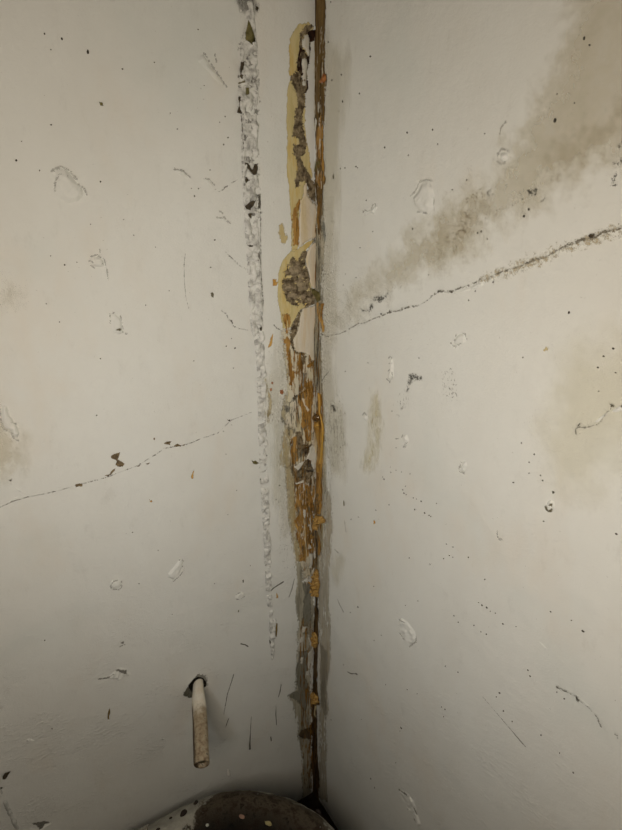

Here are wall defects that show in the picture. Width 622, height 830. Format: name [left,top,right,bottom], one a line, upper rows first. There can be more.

crack [3,415,241,506]
peeling [245,194,264,306]
peeling [273,22,321,334]
corrosion [280,0,327,800]
spalling [294,431,316,487]
crack [268,228,622,448]